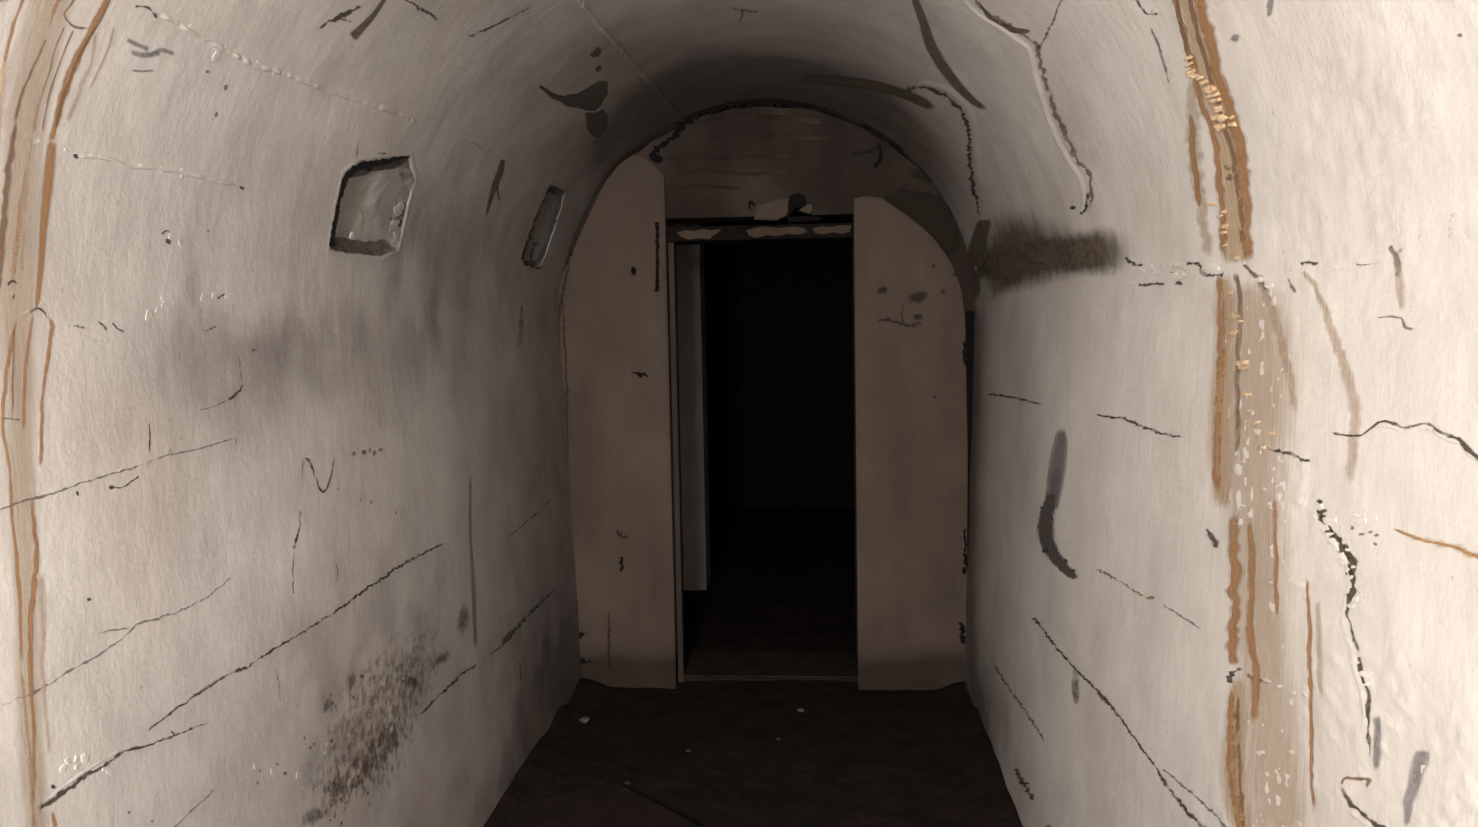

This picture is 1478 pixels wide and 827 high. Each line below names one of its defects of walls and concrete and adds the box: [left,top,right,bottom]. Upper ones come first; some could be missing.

crack [306,0,437,39]
crack [907,80,989,218]
damp [968,220,1117,297]
corrosion [0,0,112,827]
crack [20,458,553,808]
damp [1037,432,1078,579]
corrosion [1172,0,1294,827]
corrosion [1306,583,1321,804]
corrosion [1305,275,1358,468]
crack [1308,499,1386,827]
crack [1334,420,1478,463]
corrosion [1396,530,1478,558]